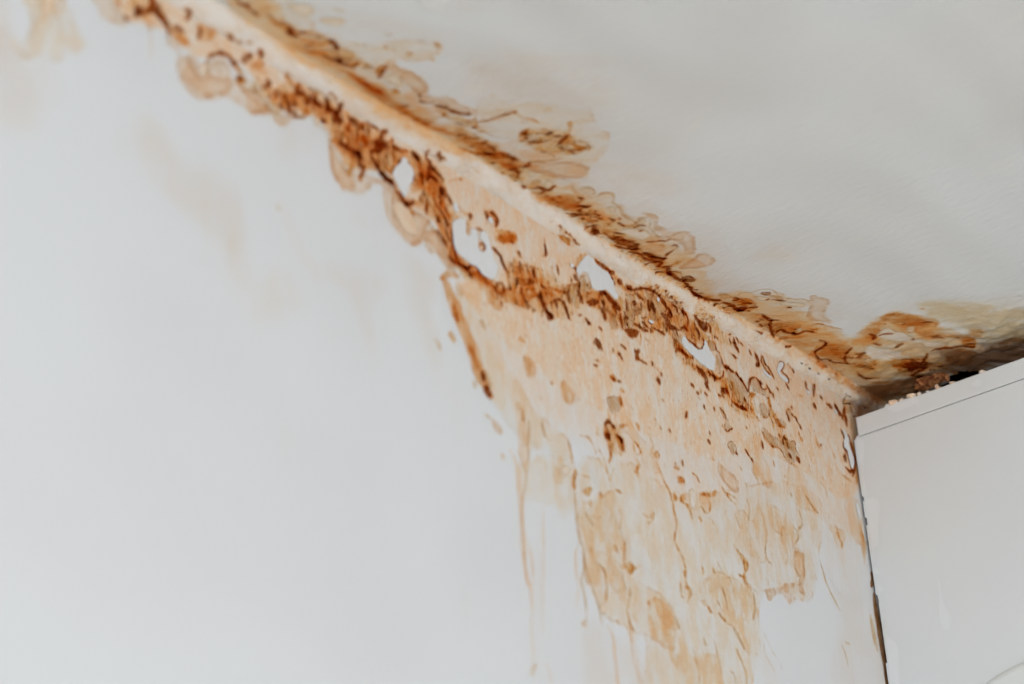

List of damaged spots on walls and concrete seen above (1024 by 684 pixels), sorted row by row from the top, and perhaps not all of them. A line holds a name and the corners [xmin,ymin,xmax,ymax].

peeling [393,156,414,196]
peeling [452,203,498,280]
peeling [570,255,618,299]
leakage [110,0,887,684]
peeling [682,336,715,370]
peeling [843,430,854,469]